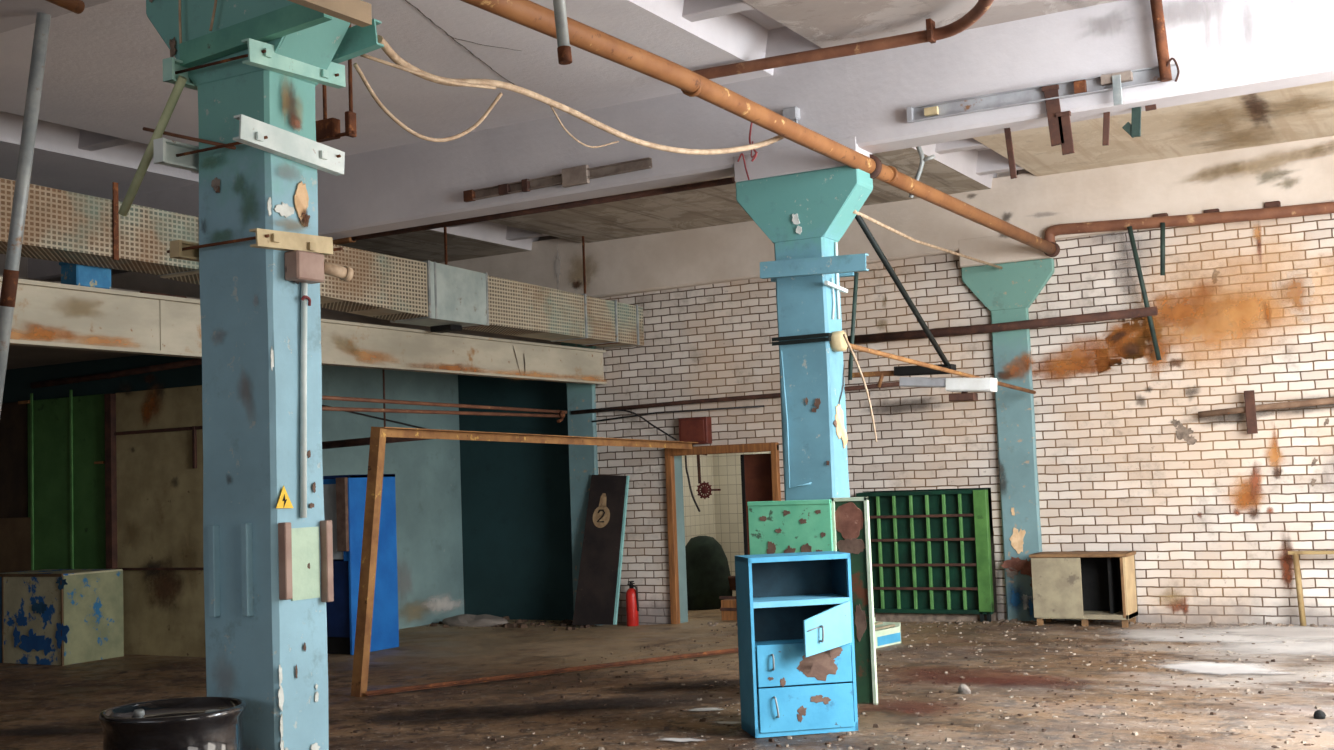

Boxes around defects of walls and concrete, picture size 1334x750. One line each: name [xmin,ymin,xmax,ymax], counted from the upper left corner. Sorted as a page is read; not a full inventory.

corrosion [285,87,301,129]
damp [1247,93,1267,121]
corrosion [10,324,129,346]
corrosion [998,287,1270,379]
peeling [805,397,848,448]
corrosion [1233,432,1281,517]
peeling [1001,507,1033,610]
corrosion [1280,540,1293,583]